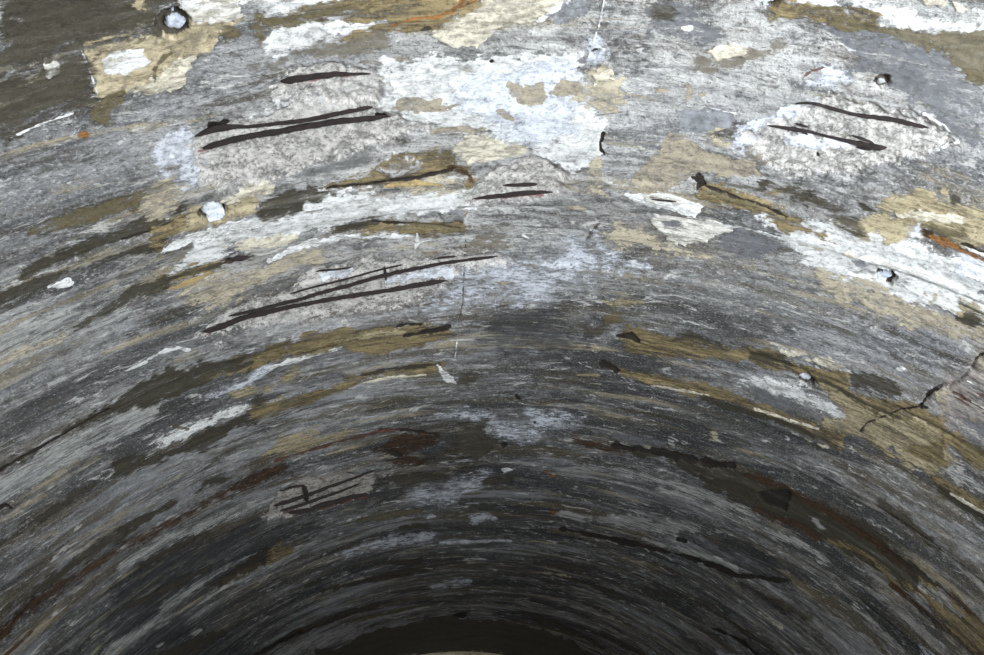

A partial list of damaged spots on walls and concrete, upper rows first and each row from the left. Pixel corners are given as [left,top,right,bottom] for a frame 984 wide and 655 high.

peeling [125,346,191,374]
spalling [81,0,627,348]
peeling [586,0,984,331]
crack [860,352,984,432]
crack [961,243,984,253]
corrosion [0,428,440,655]